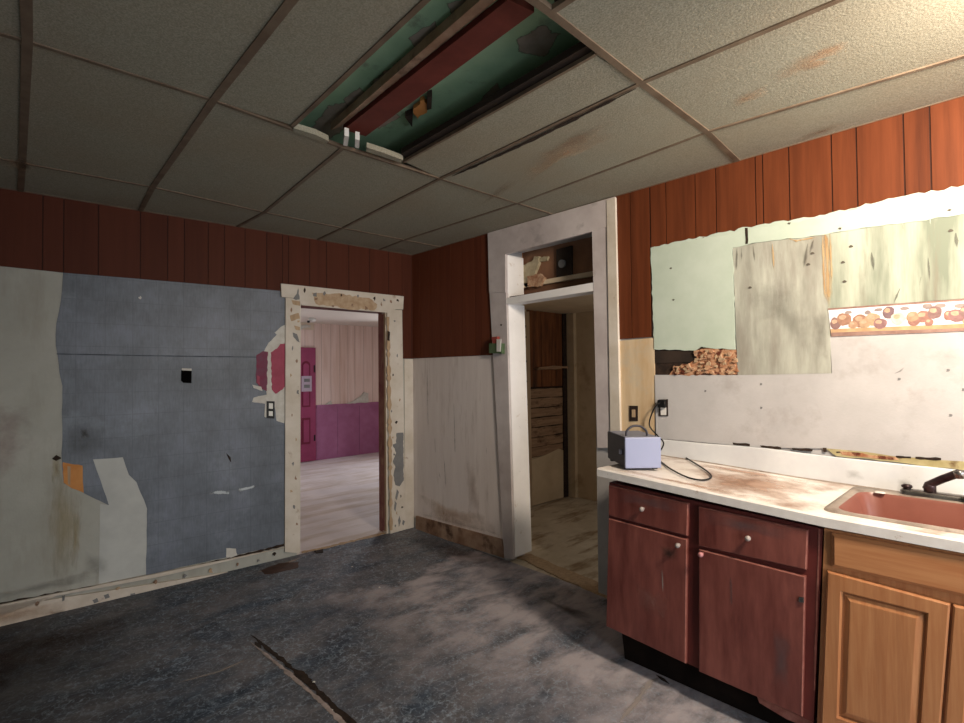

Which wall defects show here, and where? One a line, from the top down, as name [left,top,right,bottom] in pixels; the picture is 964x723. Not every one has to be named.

spalling [293,59,403,163]
spalling [378,90,432,129]
spalling [181,368,192,383]
spalling [655,347,739,376]
crack [250,635,357,723]